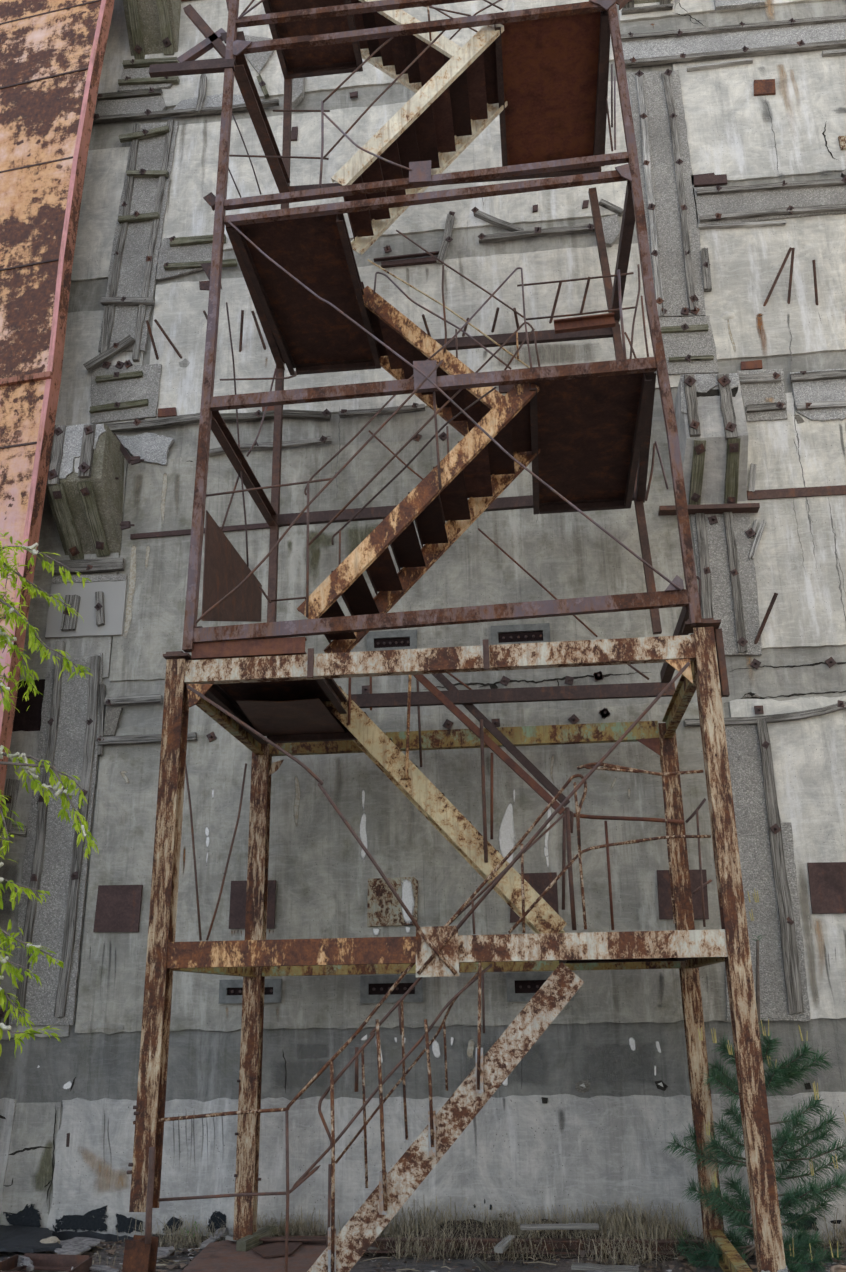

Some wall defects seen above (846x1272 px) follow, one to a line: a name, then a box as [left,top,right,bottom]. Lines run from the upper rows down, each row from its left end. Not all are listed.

corrosion [757,313,765,349]
crack [788,319,846,621]
crack [728,662,846,703]
peeling [3,1204,144,1266]